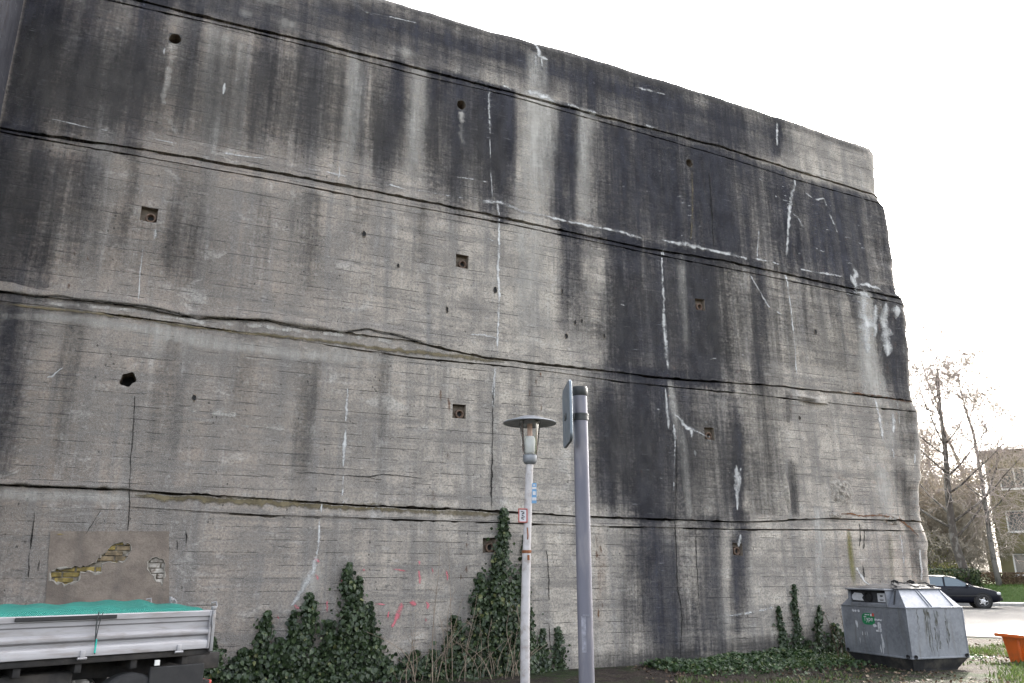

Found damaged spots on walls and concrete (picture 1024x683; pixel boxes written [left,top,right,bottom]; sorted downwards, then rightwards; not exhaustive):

crack [0,290,423,343]
leakage [0,0,786,667]
leakage [766,167,908,438]
crack [127,396,135,530]
spalling [48,542,132,587]
spalling [147,557,166,585]